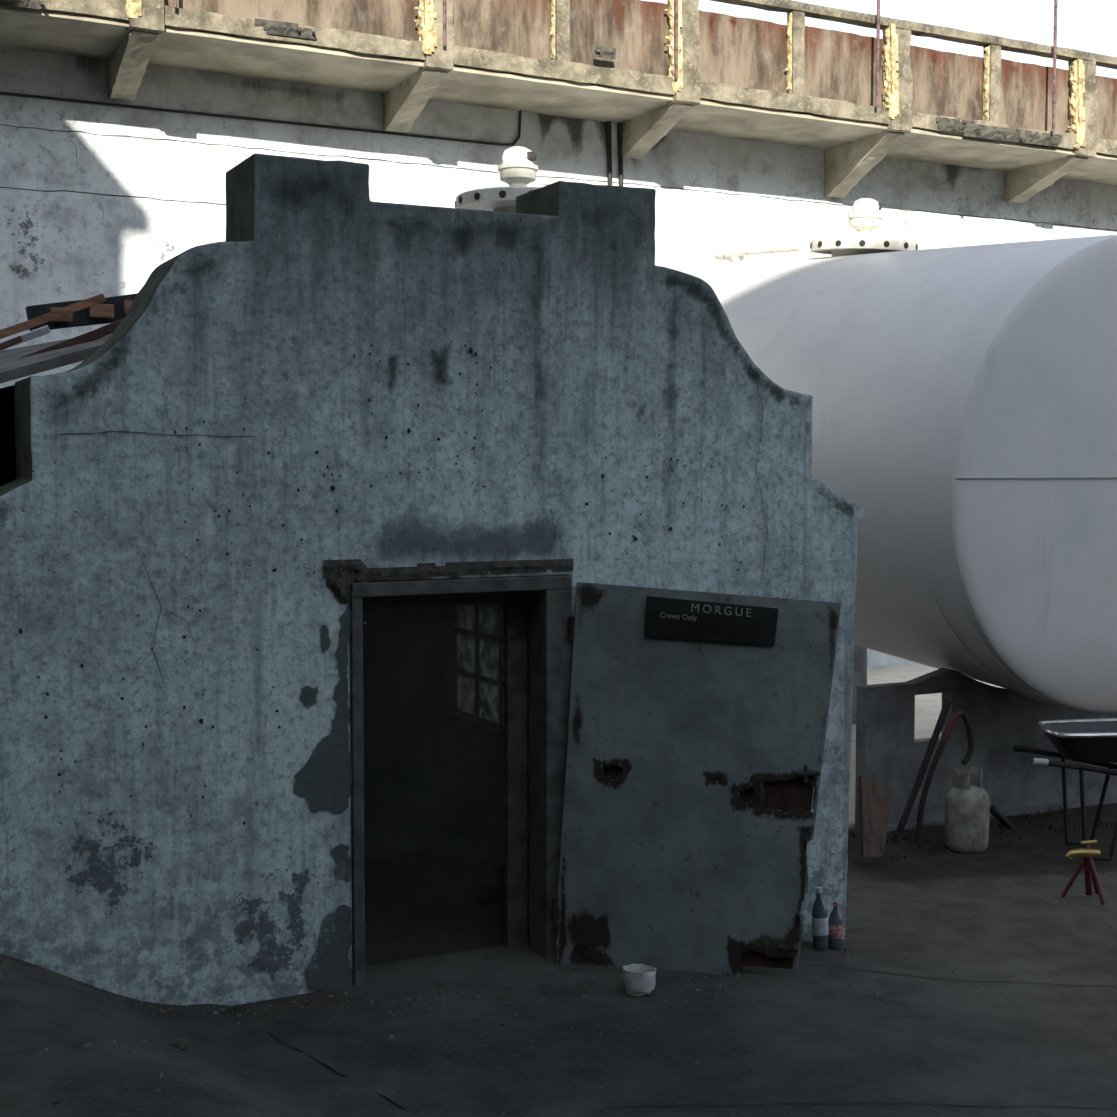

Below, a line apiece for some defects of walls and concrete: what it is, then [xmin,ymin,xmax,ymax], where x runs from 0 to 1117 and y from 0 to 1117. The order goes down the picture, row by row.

crack [0,187,226,225]
crack [134,564,196,690]
peeling [293,559,573,814]